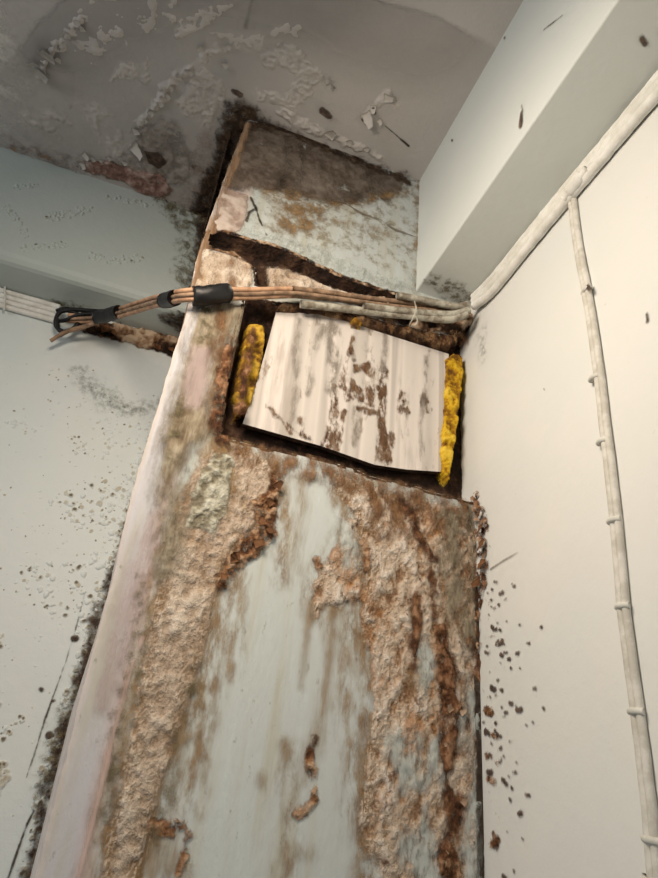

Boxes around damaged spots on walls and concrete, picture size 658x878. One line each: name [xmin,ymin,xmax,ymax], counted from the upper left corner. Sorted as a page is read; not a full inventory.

peeling [27,0,95,84]
damp [0,0,467,70]
peeling [274,105,387,163]
peeling [360,87,401,129]
spalling [195,249,253,287]
spalling [215,189,416,304]
damp [154,302,257,577]
spalling [78,294,480,878]
damp [437,511,530,670]
damp [18,477,136,878]
damp [482,679,523,802]
damp [490,831,500,852]